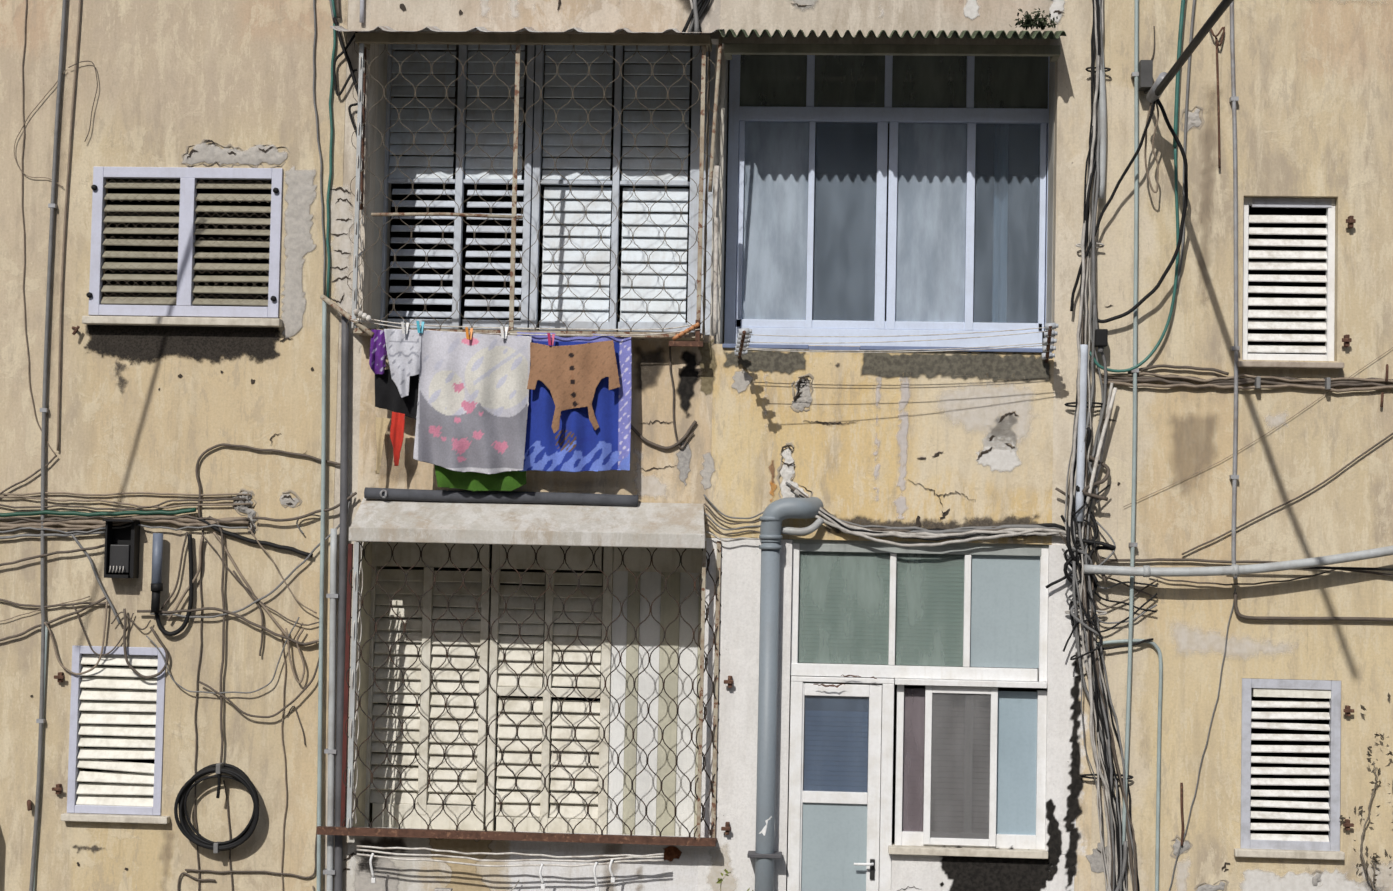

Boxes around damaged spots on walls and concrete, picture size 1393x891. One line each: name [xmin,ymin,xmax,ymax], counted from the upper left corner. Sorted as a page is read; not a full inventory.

peeling [964,0,979,19]
peeling [1049,0,1065,22]
flaking render [181,139,290,168]
flaking render [790,373,814,412]
peeling [940,386,1032,471]
peeling [1170,834,1393,891]